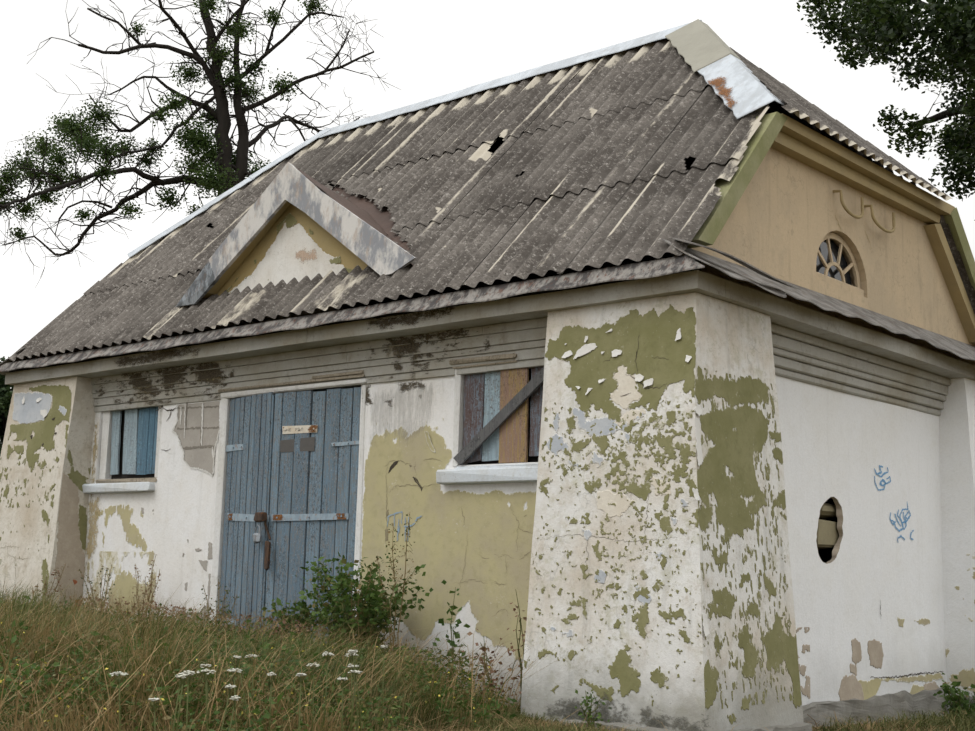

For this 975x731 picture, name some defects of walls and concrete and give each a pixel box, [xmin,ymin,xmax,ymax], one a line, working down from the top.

corrosion [708,77,738,108]
flaking render [0,384,157,617]
flaking render [187,539,213,572]
peeling [359,304,810,724]
spalling [816,497,843,564]
peeling [897,617,930,627]
spalling [838,638,975,701]